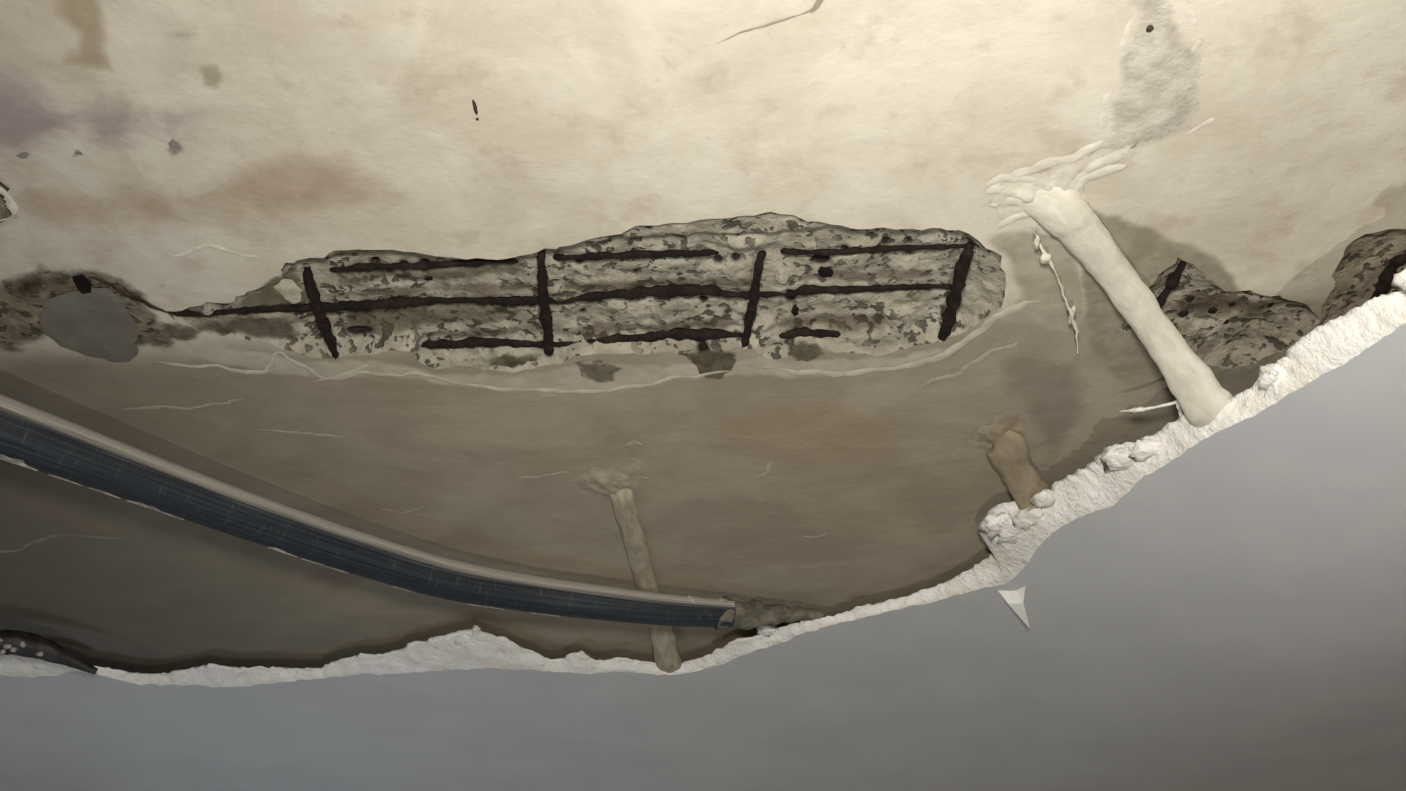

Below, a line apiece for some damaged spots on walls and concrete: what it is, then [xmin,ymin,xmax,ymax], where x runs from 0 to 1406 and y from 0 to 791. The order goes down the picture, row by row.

crack [715,0,824,45]
spalling [0,182,18,223]
spalling [0,206,1406,688]